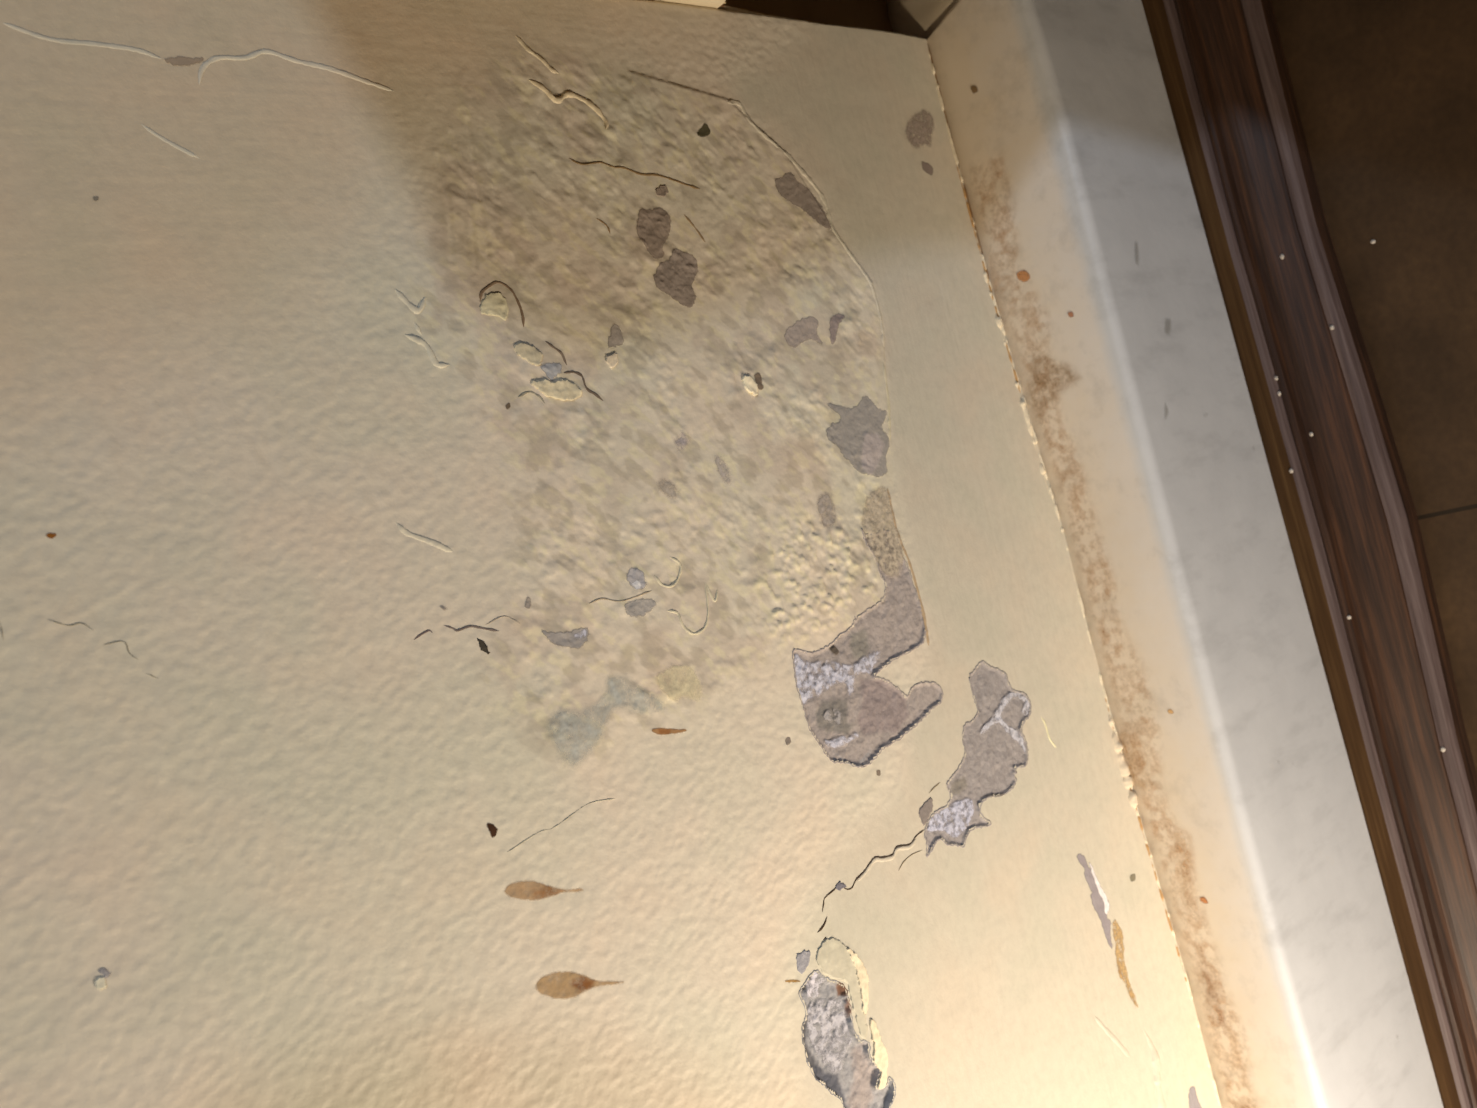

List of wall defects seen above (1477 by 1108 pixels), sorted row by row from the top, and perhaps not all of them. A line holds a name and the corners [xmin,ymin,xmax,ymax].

peeling [637,185,698,307]
peeling [775,173,832,229]
peeling [792,396,943,768]
water stain [554,667,700,761]
peeling [919,660,1032,858]
crack [817,829,925,939]
peeling [1077,854,1138,1006]
water stain [1125,747,1187,982]
spalling [796,937,896,1108]